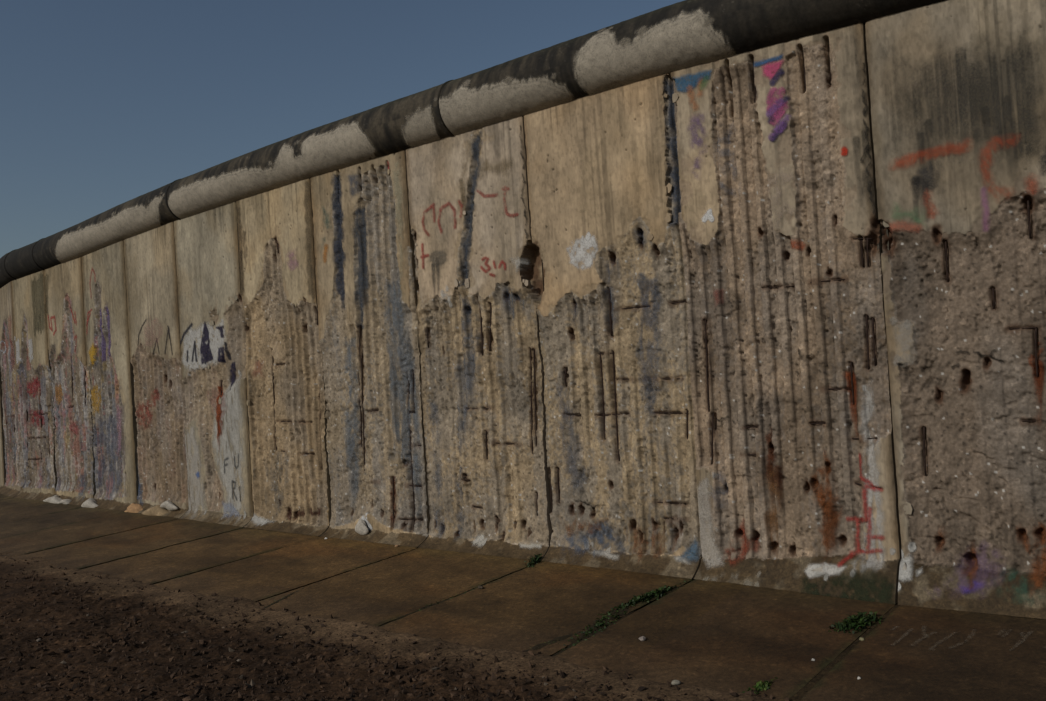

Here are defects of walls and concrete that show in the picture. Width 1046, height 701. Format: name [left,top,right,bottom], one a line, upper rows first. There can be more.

spalling [0,281,126,500]
spalling [55,9,1046,591]
rust [766,433,782,492]